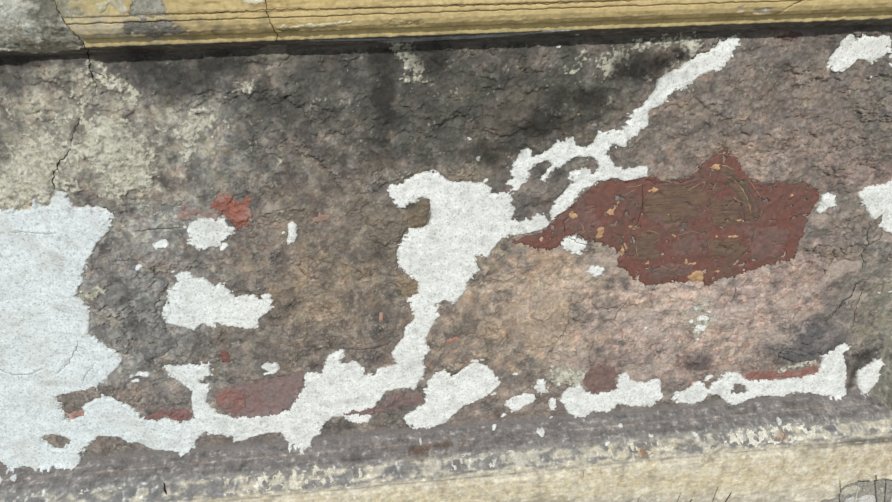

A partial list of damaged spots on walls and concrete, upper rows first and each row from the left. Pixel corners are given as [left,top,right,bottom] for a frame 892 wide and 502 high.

spalling [0,0,85,54]
crack [55,2,105,100]
spalling [96,0,187,39]
peeling [280,21,352,29]
crack [142,0,631,40]
peeling [826,31,892,72]
crack [51,119,79,190]
peeling [816,192,837,214]
peeling [857,178,892,235]
peeling [0,30,741,484]
peeling [492,343,885,437]
peeling [200,465,362,496]